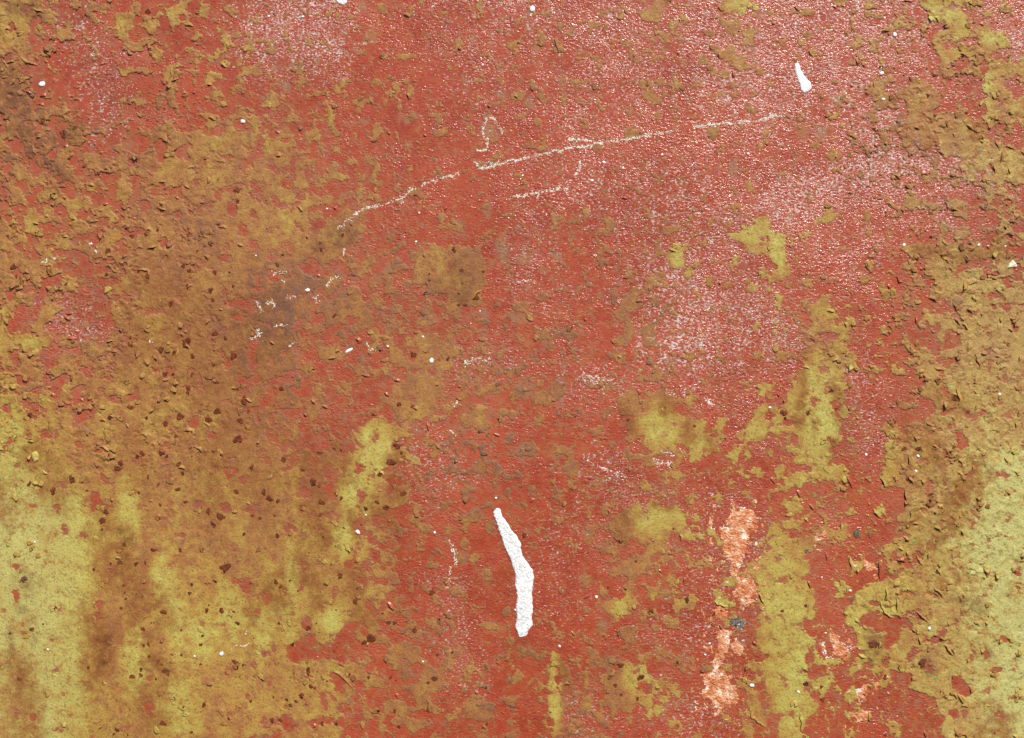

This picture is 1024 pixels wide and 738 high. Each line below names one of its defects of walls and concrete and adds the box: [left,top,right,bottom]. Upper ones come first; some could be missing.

peeling [0,0,586,738]
peeling [496,0,1024,738]